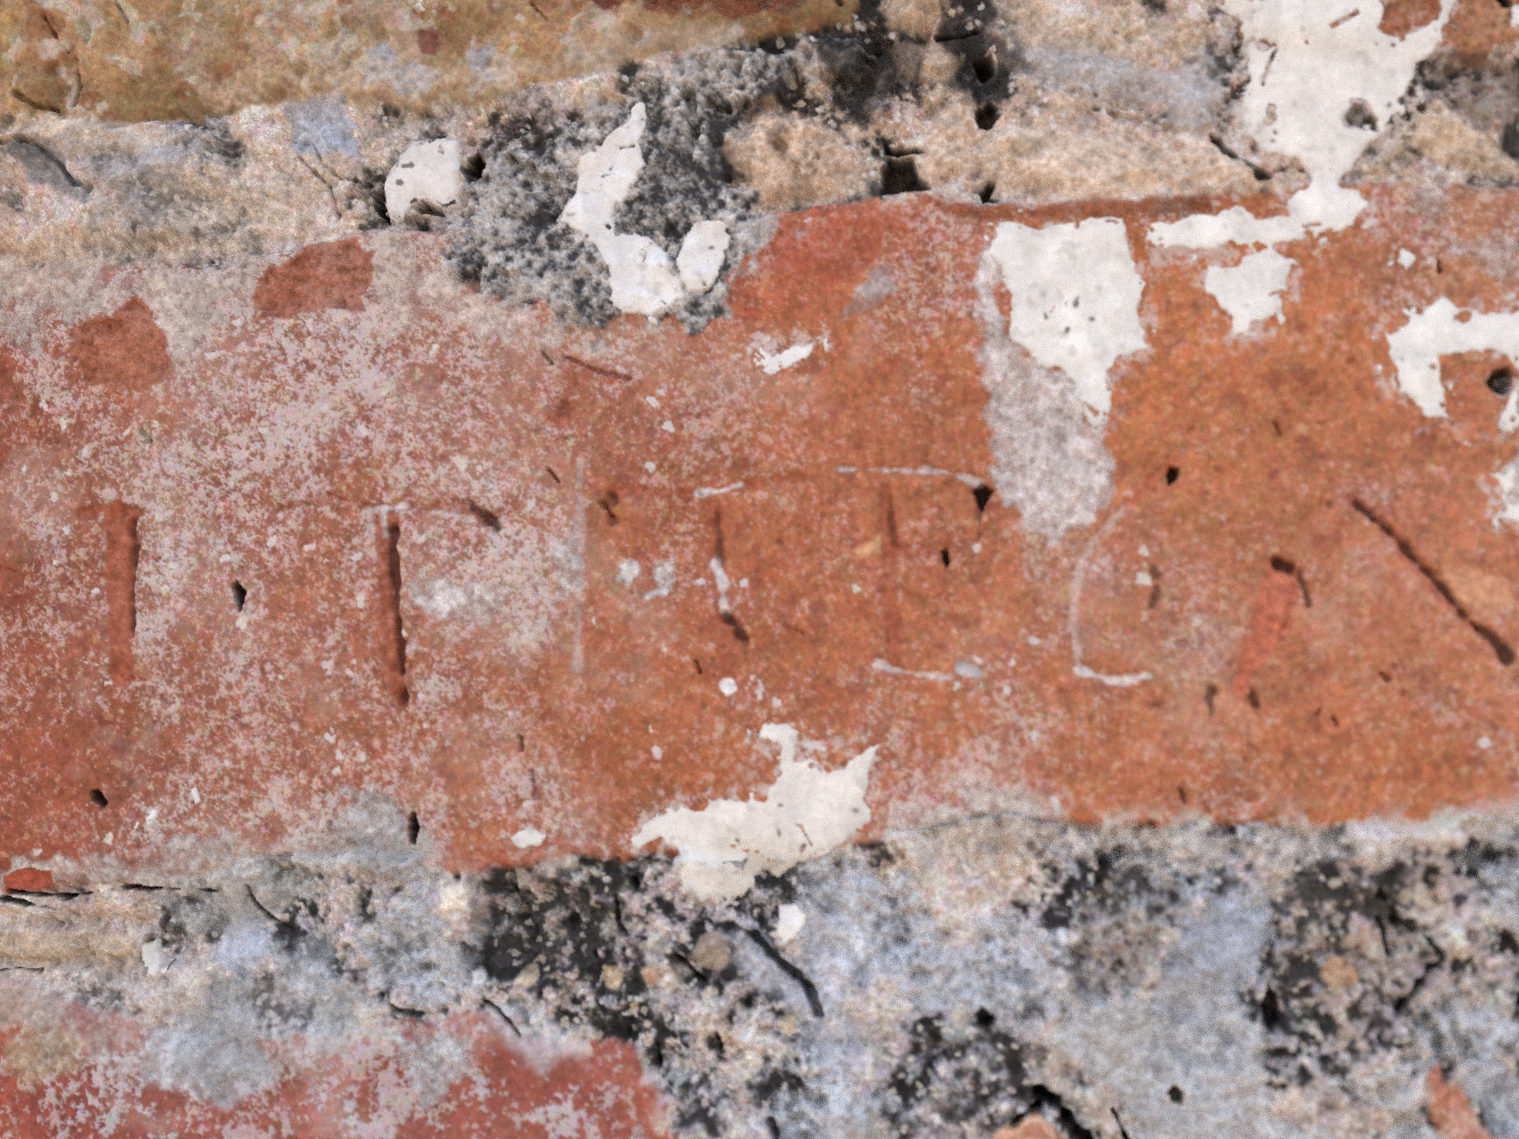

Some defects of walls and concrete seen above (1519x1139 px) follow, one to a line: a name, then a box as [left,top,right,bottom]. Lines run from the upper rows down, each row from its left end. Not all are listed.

crack [1495,0,1516,9]
spalling [381,0,877,340]
peeling [1146,0,1519,336]
peeling [984,217,1161,433]
peeling [1372,297,1519,433]
peeling [1490,466,1519,531]
peeling [630,723,880,910]
peeling [777,901,811,944]
crack [1009,1082,1132,1139]